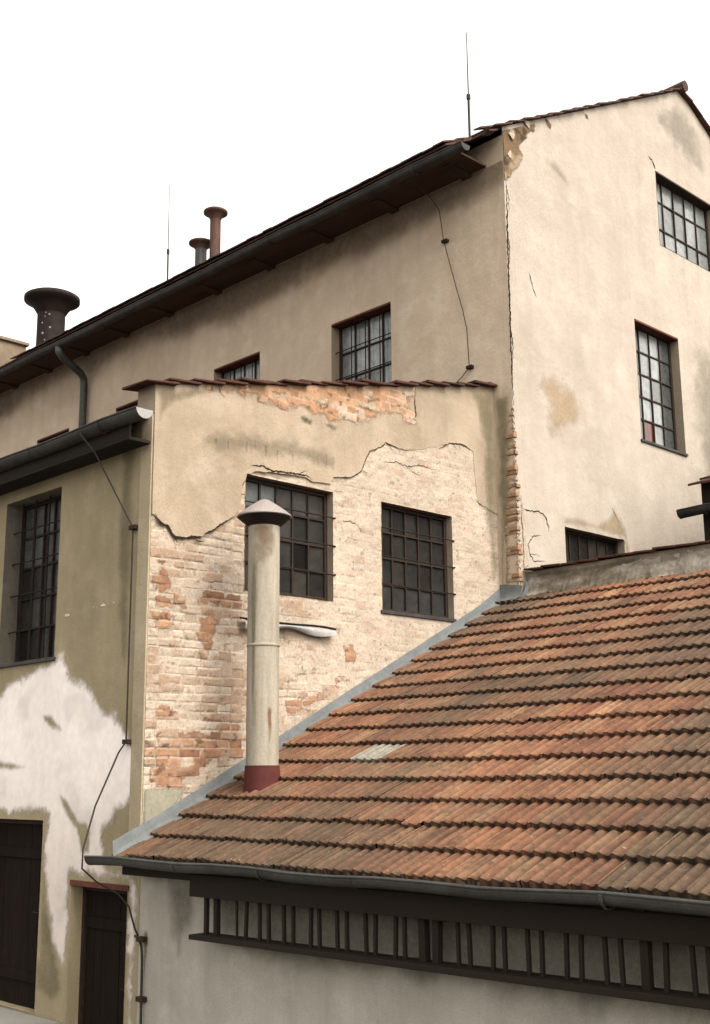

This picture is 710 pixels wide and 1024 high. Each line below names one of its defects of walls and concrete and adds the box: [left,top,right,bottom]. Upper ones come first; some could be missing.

spalling [458,118,551,180]
crack [506,185,536,406]
flaking render [205,385,416,424]
crack [242,465,311,486]
crack [336,442,468,478]
crack [155,514,234,544]
crack [523,508,548,562]
peeling [142,407,529,823]
peeling [0,653,131,963]
peeling [126,880,137,1001]